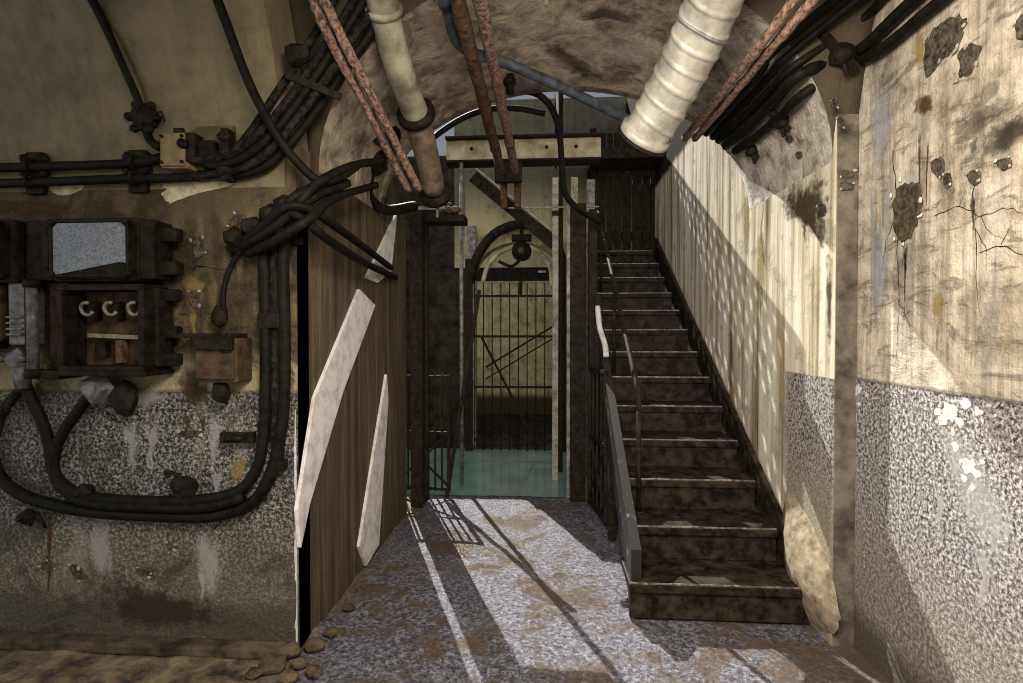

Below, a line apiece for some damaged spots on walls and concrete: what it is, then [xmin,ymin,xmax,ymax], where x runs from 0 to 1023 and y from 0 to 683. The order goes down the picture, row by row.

spalling [1011,8,1023,40]
spalling [923,12,982,84]
spalling [929,155,952,189]
spalling [964,169,982,186]
spalling [889,177,923,299]